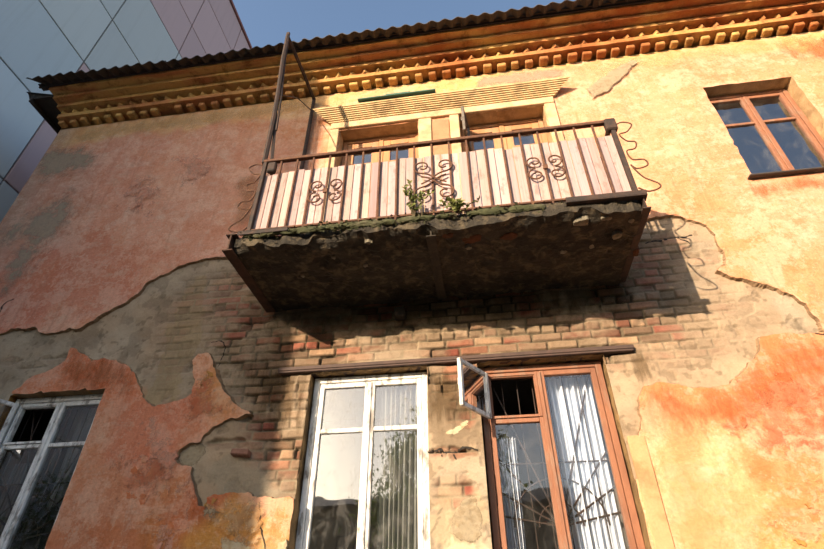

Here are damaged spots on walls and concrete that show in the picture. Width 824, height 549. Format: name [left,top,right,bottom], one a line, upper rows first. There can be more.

flaking render [0,215,824,549]